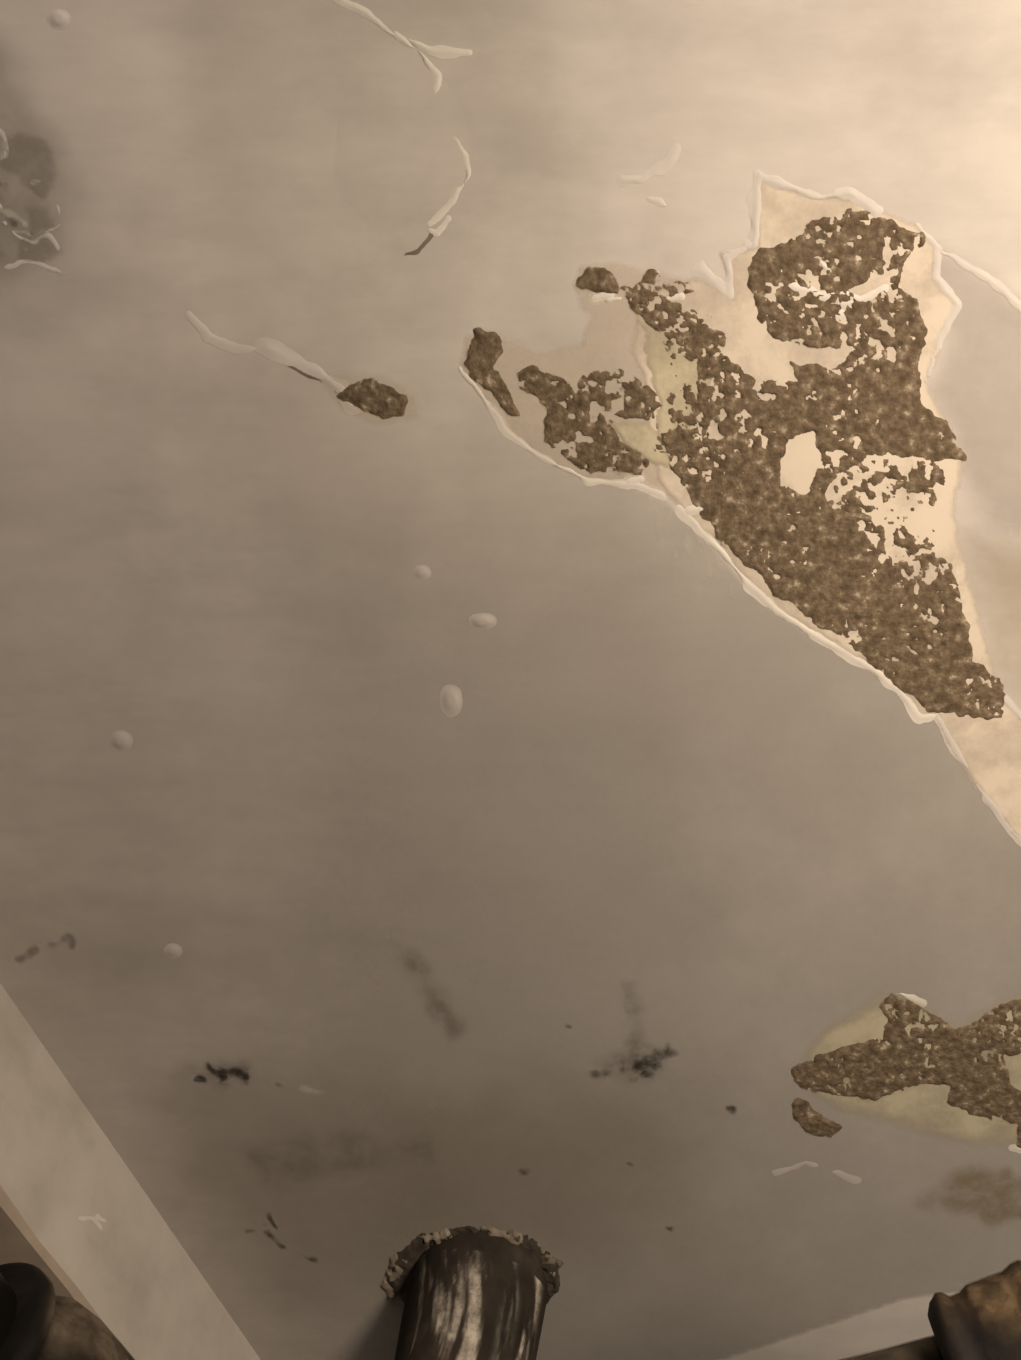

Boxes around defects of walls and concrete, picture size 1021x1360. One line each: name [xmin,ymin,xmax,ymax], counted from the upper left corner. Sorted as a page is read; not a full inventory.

crack [333,0,473,94]
crack [405,136,471,255]
peeling [186,311,408,419]
peeling [458,169,1021,847]
water stain [207,1065,245,1078]
peeling [791,993,1021,1154]